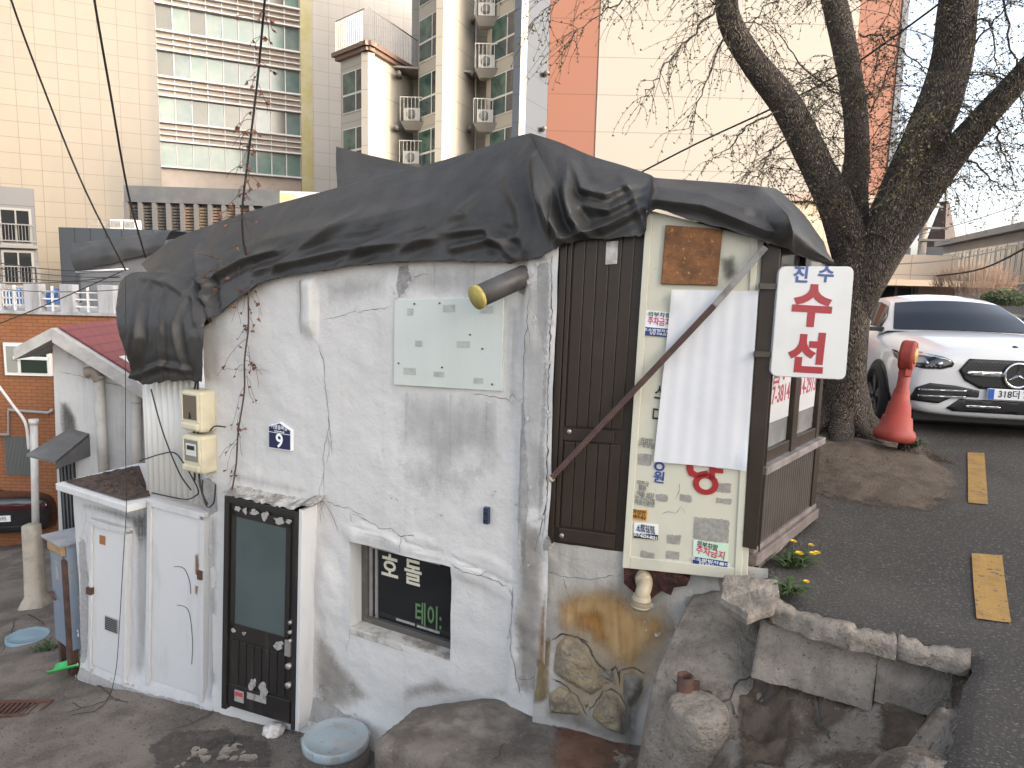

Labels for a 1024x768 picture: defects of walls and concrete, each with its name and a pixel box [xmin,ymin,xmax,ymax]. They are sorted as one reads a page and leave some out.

spalling [393,262,414,300]
crack [319,347,414,552]
crack [476,260,553,561]
rust [564,595,666,704]